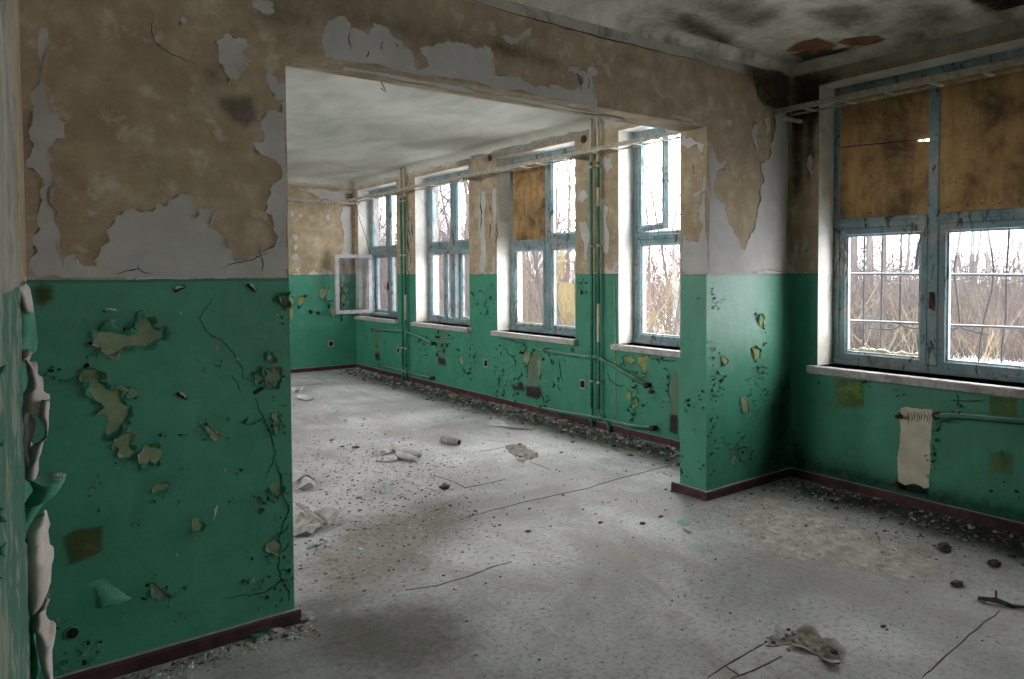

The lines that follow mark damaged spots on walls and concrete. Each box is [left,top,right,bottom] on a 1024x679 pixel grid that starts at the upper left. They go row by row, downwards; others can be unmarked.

peeling [321,16,624,119]
damp [677,15,730,45]
damp [973,0,1024,10]
peeling [600,157,613,173]
peeling [679,76,809,274]
peeling [578,190,618,272]
peeling [20,28,353,679]
crack [199,297,291,601]
peeling [493,342,560,404]
peeling [620,347,756,486]
peeling [739,309,769,427]